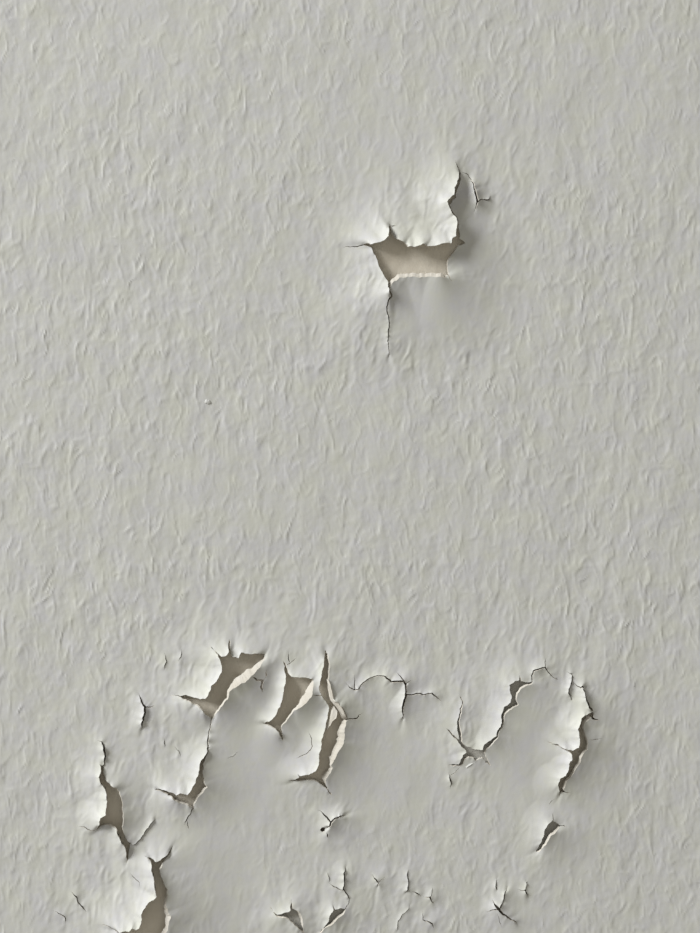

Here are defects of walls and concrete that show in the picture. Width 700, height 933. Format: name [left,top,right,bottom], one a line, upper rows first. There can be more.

peeling [281,101,543,395]
peeling [32,579,642,933]
crack [299,805,450,933]
crack [349,650,448,748]